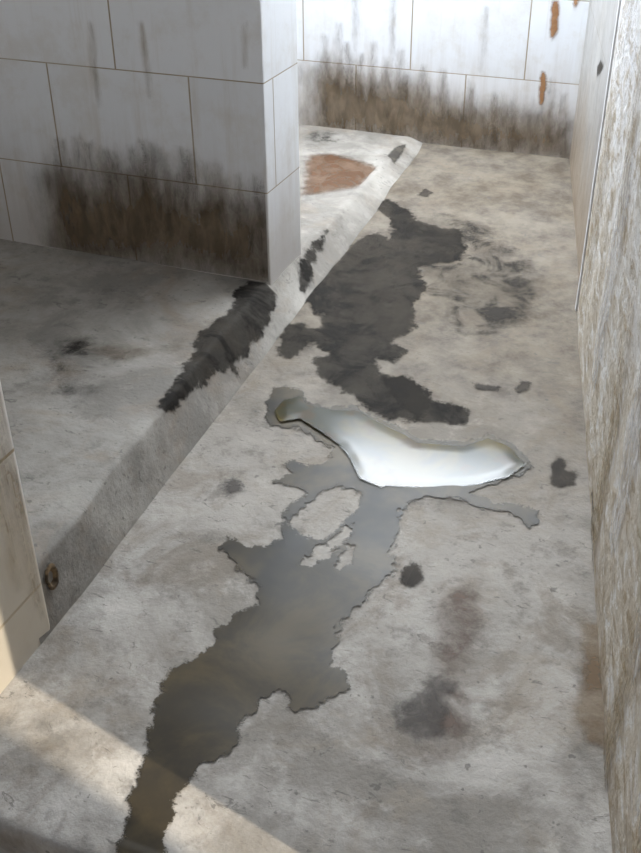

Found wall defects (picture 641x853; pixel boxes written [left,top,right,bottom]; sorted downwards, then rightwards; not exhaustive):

damp [313,67,570,158]
rust [550,1,559,38]
damp [46,171,277,412]
damp [115,199,540,853]